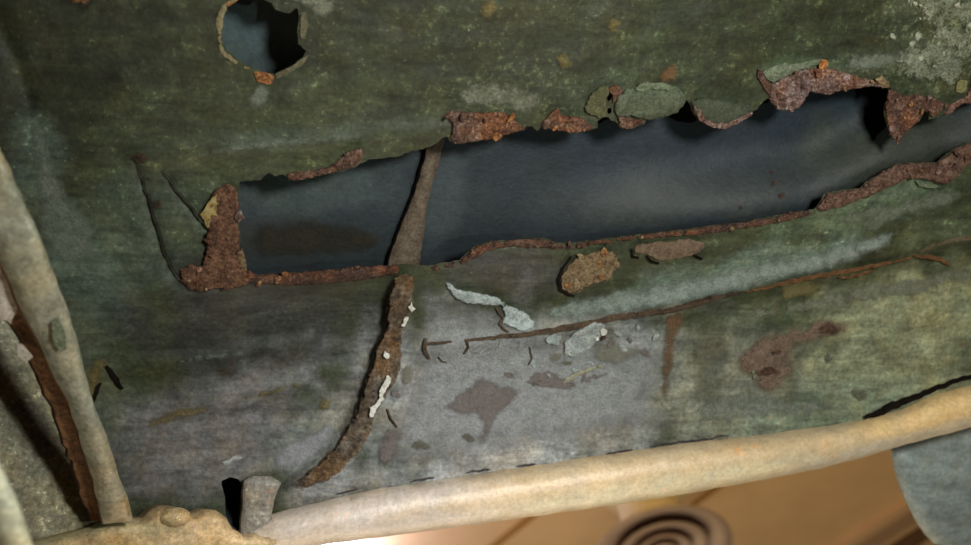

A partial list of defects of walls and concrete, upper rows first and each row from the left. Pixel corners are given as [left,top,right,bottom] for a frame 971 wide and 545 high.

peeling [896,0,971,85]
rust [445,111,525,144]
rust [542,108,593,133]
rust [180,183,399,292]
rust [431,143,971,271]
peeling [369,193,967,463]
rust [740,321,845,391]
crack [864,375,971,419]